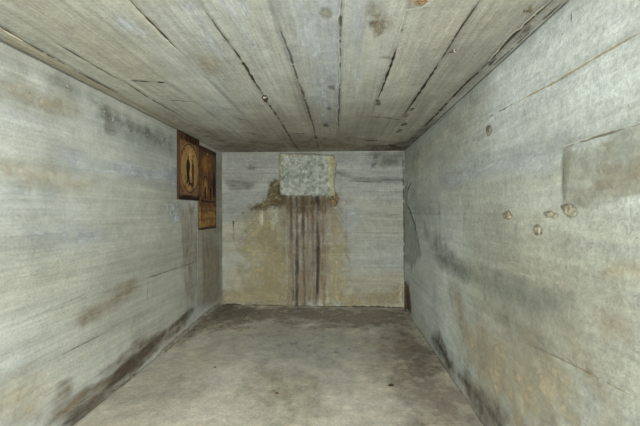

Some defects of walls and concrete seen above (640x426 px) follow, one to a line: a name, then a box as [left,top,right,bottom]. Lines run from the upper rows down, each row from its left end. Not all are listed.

crack [130,0,177,49]
crack [203,8,318,150]
crack [335,0,343,128]
crack [369,2,479,120]
crack [421,0,572,130]
crack [491,31,640,116]
spalling [254,180,285,210]
crack [563,121,640,184]
leakage [55,310,193,424]
leakage [209,205,503,426]